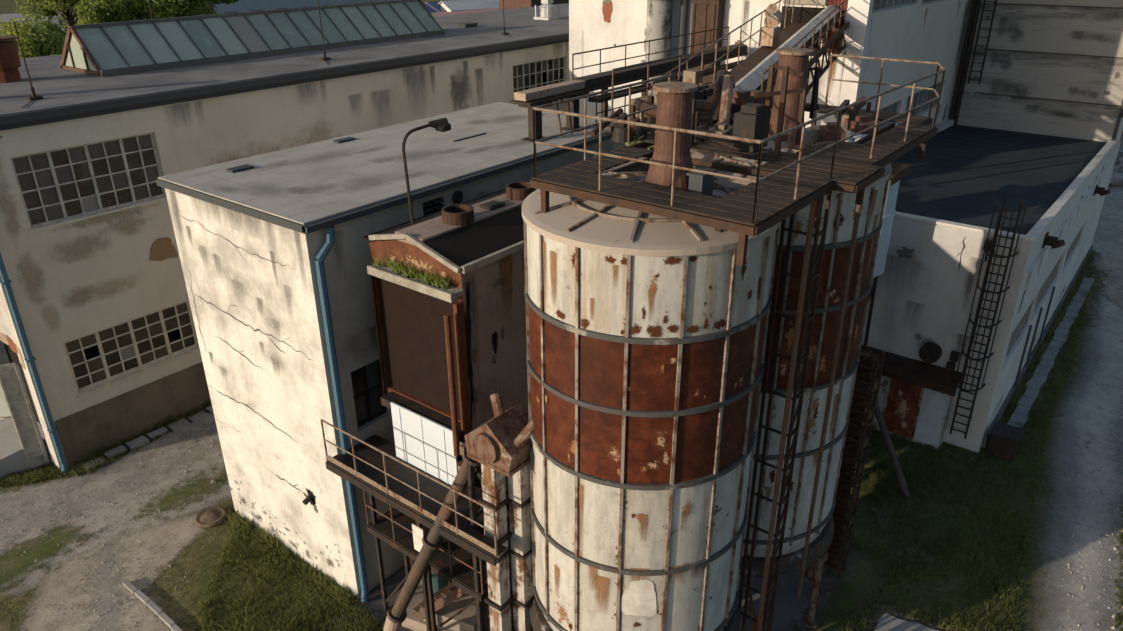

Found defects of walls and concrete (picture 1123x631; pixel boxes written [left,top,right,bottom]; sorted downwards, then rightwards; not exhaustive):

crack [187,264,311,368]
rust [543,242,556,296]
rust [580,298,594,329]
rust [620,256,727,338]
crack [208,385,297,442]